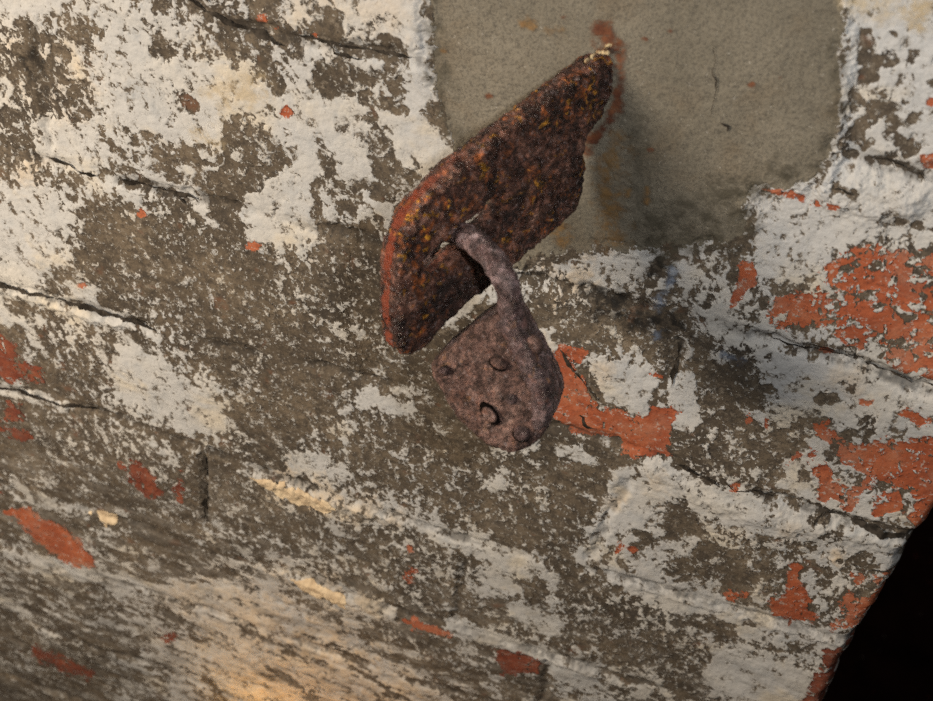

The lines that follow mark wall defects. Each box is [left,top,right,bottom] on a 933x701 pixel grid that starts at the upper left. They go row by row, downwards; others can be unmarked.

peeling [3,18,106,154]
peeling [174,81,200,126]
peeling [222,0,304,57]
peeling [306,4,434,127]
corrosion [584,21,624,155]
crack [870,156,925,180]
peeling [0,113,596,569]
peeling [544,284,933,529]
flaking render [766,244,933,380]
crack [770,336,933,386]
crack [675,464,773,496]
peeling [0,603,187,701]